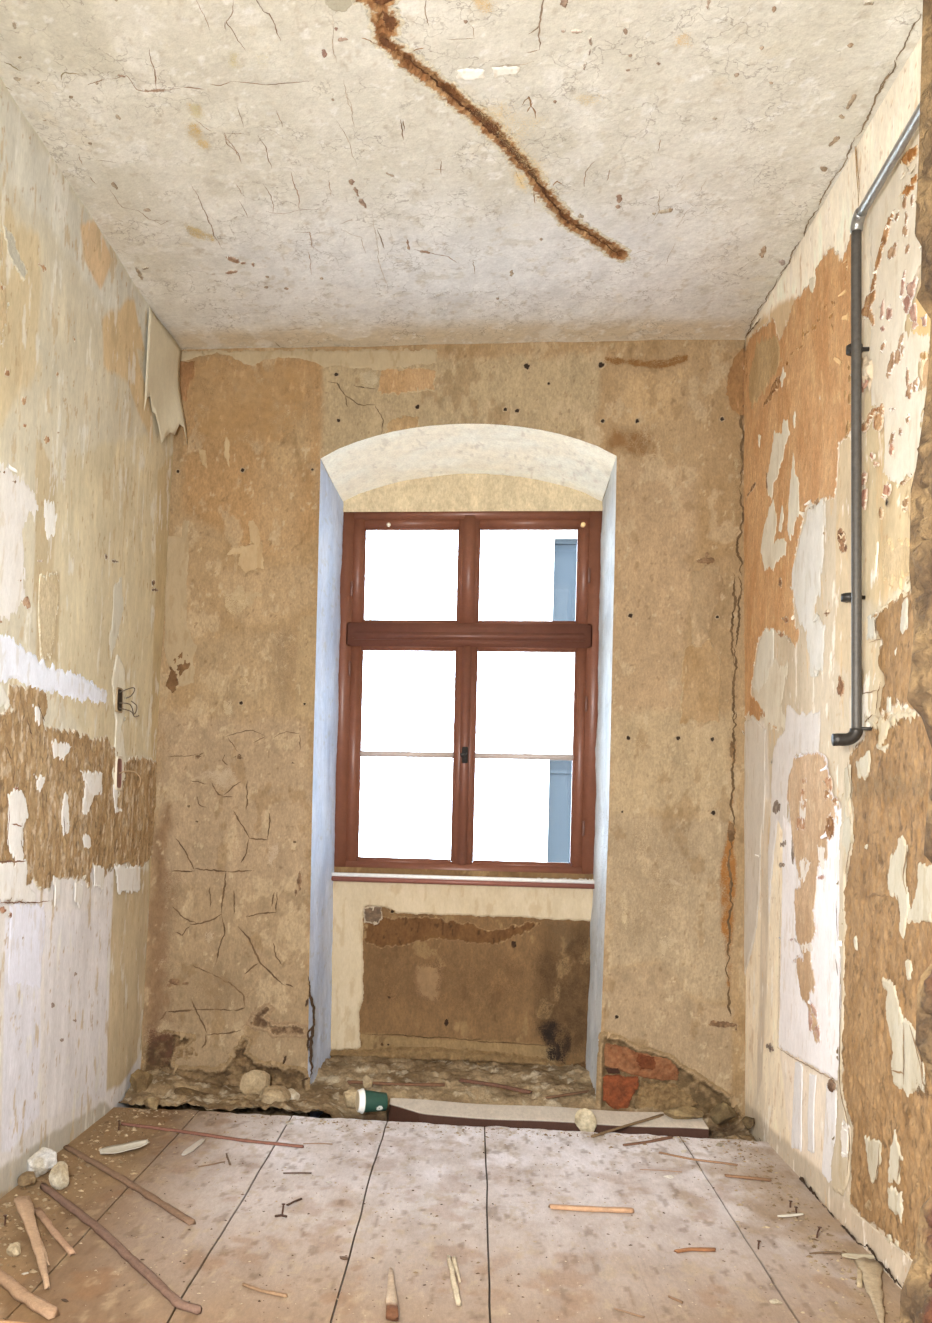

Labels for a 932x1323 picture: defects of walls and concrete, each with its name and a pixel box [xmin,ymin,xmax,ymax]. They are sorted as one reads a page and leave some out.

crack [196,0,281,49]
crack [61,50,475,282]
crack [325,0,706,265]
spalling [763,144,930,520]
spalling [823,527,848,553]
peeling [0,683,157,918]
crack [159,730,315,1081]
peeling [363,906,541,949]
rust [718,745,738,992]
peeling [772,537,932,1260]
spalling [330,1043,554,1066]
spalling [570,1031,744,1119]